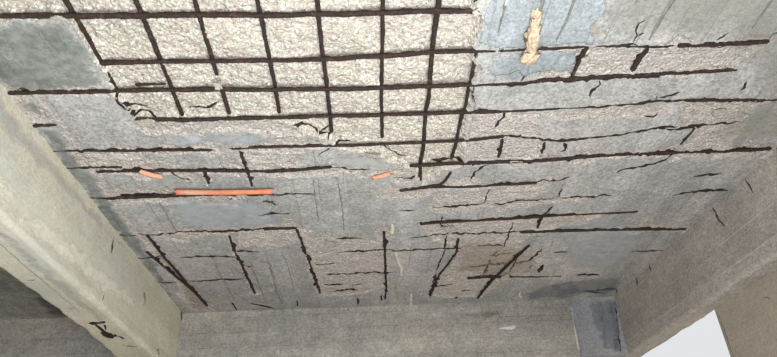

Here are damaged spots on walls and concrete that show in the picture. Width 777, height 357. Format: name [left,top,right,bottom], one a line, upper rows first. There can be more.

spalling [530,33,776,84]
spalling [0,0,691,312]
spalling [409,96,777,168]
crack [676,173,729,227]
crack [111,193,313,310]
crack [316,177,612,310]
crack [598,250,665,286]
crack [577,273,621,351]